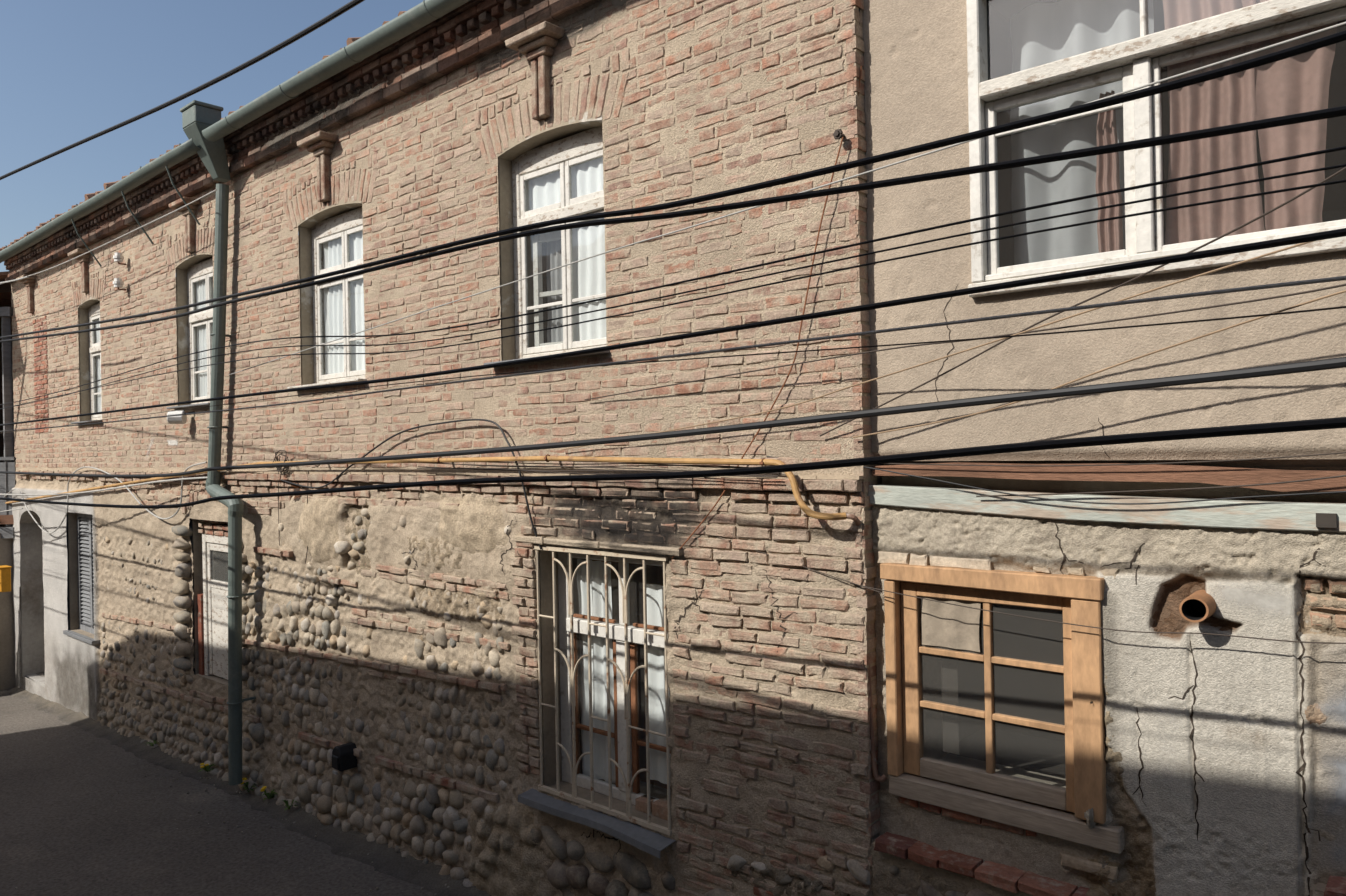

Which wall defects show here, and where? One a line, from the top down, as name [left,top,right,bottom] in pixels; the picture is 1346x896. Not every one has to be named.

flaking render [1152,576,1240,638]
flaking render [1225,577,1346,637]
crack [1132,707,1145,804]
crack [1168,641,1205,841]